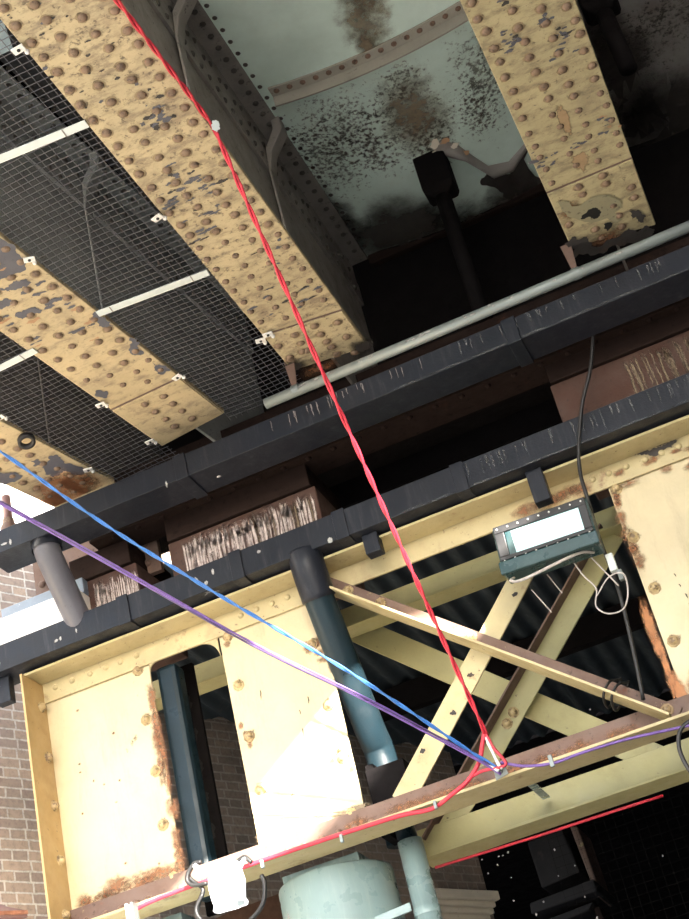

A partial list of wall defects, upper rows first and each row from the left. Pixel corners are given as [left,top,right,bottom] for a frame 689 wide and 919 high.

peeling [135,82,176,130]
leakage [370,59,459,160]
peeling [156,162,228,217]
peeling [565,208,654,258]
peeling [0,238,77,327]
peeling [0,472,23,485]
peeling [31,455,85,477]
rust [39,475,97,506]
rust [612,469,645,568]
rust [642,606,689,698]
rust [148,686,177,819]
rust [79,828,184,907]